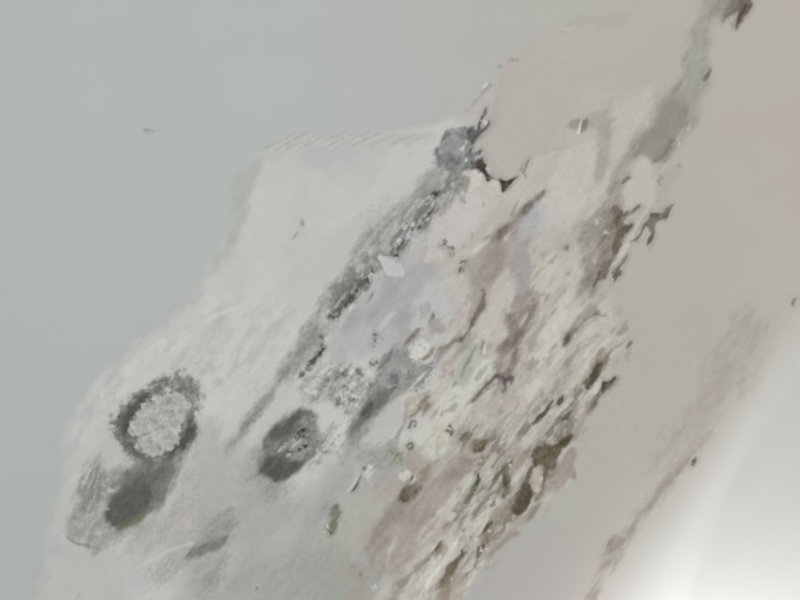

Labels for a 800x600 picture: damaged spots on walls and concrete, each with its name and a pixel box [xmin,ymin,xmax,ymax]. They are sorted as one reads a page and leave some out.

peeling [55,113,465,469]
leakage [22,122,782,600]
peeling [398,77,661,600]
leakage [434,0,759,414]